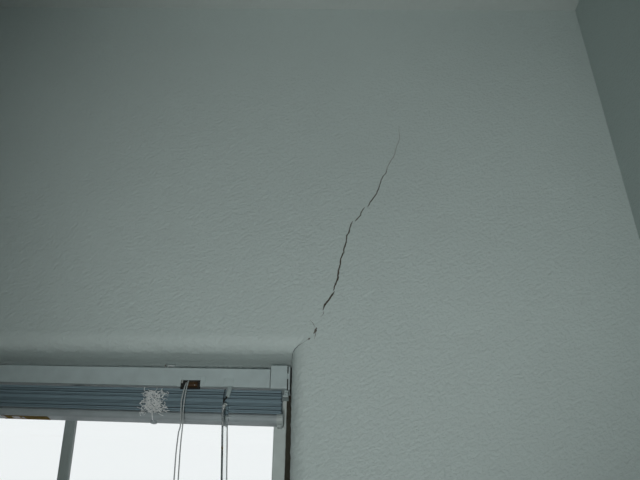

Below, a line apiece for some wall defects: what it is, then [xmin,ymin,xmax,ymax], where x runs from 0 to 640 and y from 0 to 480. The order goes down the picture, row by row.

crack [292,131,400,357]